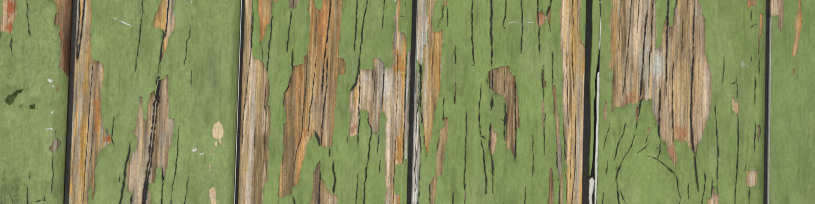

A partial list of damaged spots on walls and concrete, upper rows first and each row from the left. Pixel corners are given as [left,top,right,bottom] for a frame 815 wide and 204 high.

peeling [0,0,19,34]
peeling [48,0,112,204]
peeling [125,0,176,204]
peeling [238,0,346,204]
peeling [347,0,449,204]
crack [242,0,576,204]
peeling [487,65,520,162]
peeling [535,0,585,204]
peeling [602,0,712,165]
crack [602,0,760,204]
peeling [746,0,802,56]